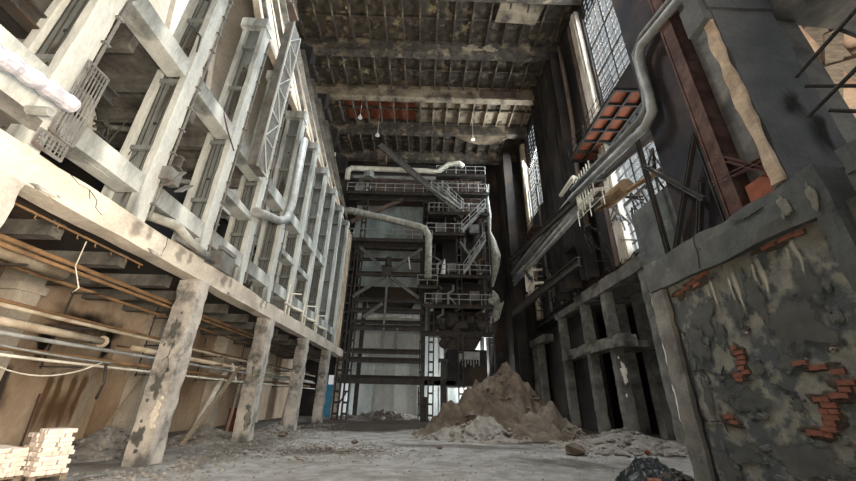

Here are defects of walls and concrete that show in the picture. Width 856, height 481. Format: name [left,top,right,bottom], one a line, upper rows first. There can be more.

flaking render [749,229,807,256]
damp [785,241,803,268]
flaking render [671,270,713,300]
damp [728,273,745,309]
damp [751,259,769,290]
peeling [790,258,833,314]
peeling [699,268,770,426]
flaking render [789,338,856,443]